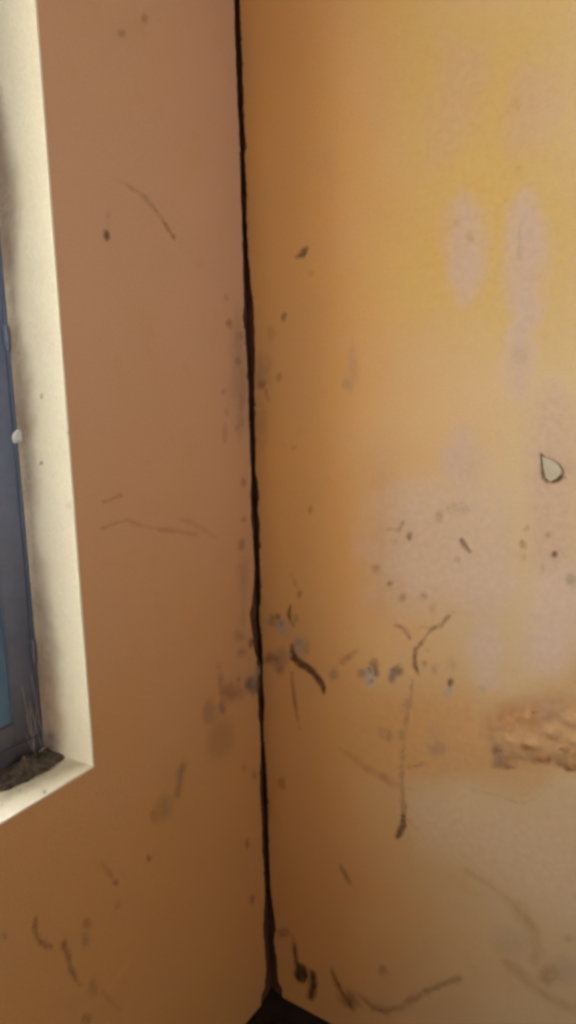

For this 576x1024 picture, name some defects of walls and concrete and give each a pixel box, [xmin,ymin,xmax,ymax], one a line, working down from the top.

crack [234,0,283,1003]
peeling [537,452,569,485]
crack [287,606,327,729]
crack [393,610,454,841]